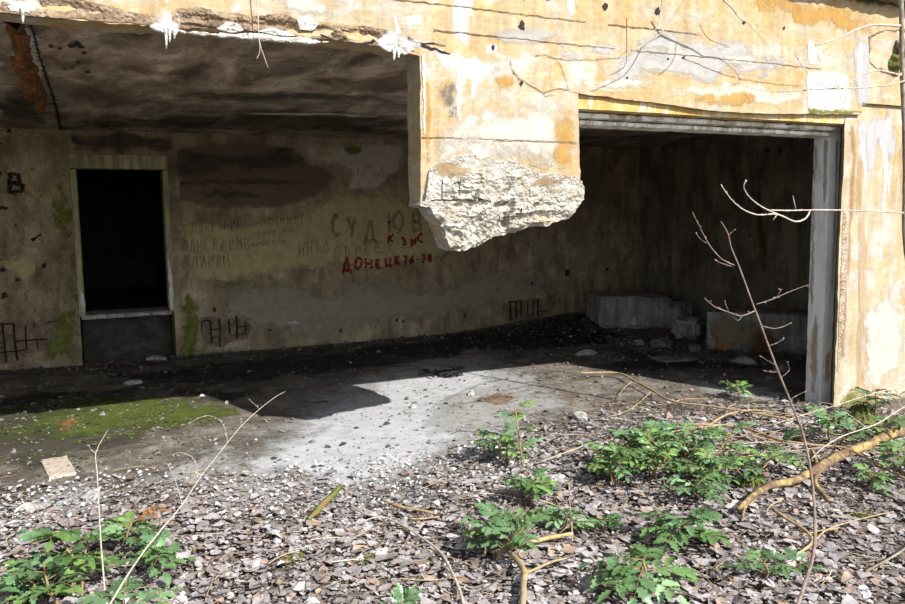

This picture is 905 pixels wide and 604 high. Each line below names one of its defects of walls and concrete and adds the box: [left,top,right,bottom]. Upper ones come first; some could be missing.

corrosion [4,21,47,115]
crack [180,21,218,29]
spalling [0,0,403,48]
leakage [149,10,329,49]
crack [320,34,375,46]
leakage [375,13,516,144]
leakage [453,0,473,44]
crack [401,0,586,22]
crack [408,24,822,97]
peeling [584,33,851,111]
peeling [183,99,585,281]
leakage [0,312,616,469]